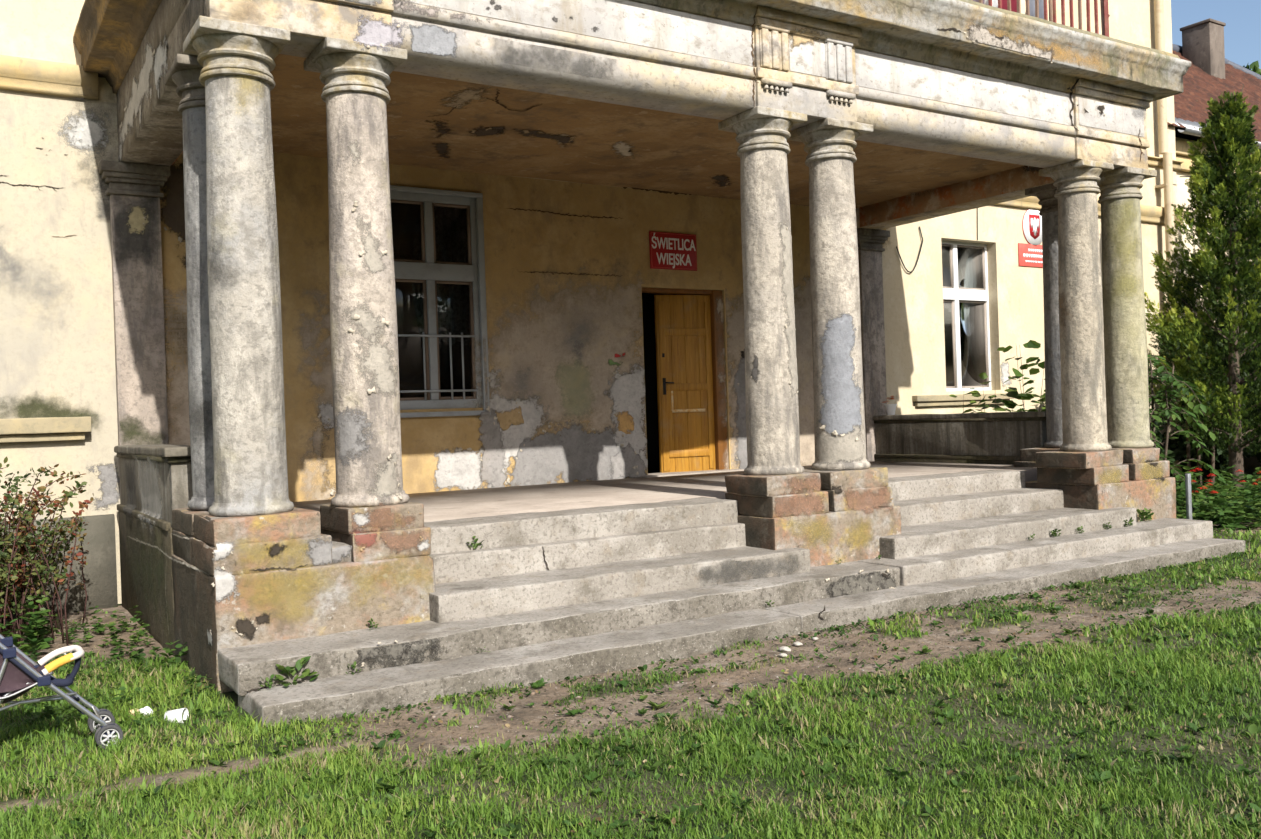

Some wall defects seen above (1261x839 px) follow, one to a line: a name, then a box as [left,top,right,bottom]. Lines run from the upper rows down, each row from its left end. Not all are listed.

peeling [335,0,502,52]
flaking render [58,36,168,160]
crack [486,89,542,112]
crack [0,175,59,191]
peeling [351,201,388,273]
peeling [299,292,398,500]
peeling [433,273,648,491]
peeling [715,293,759,469]
peeling [775,223,893,516]
peeling [349,453,430,553]
flaking render [211,541,240,602]